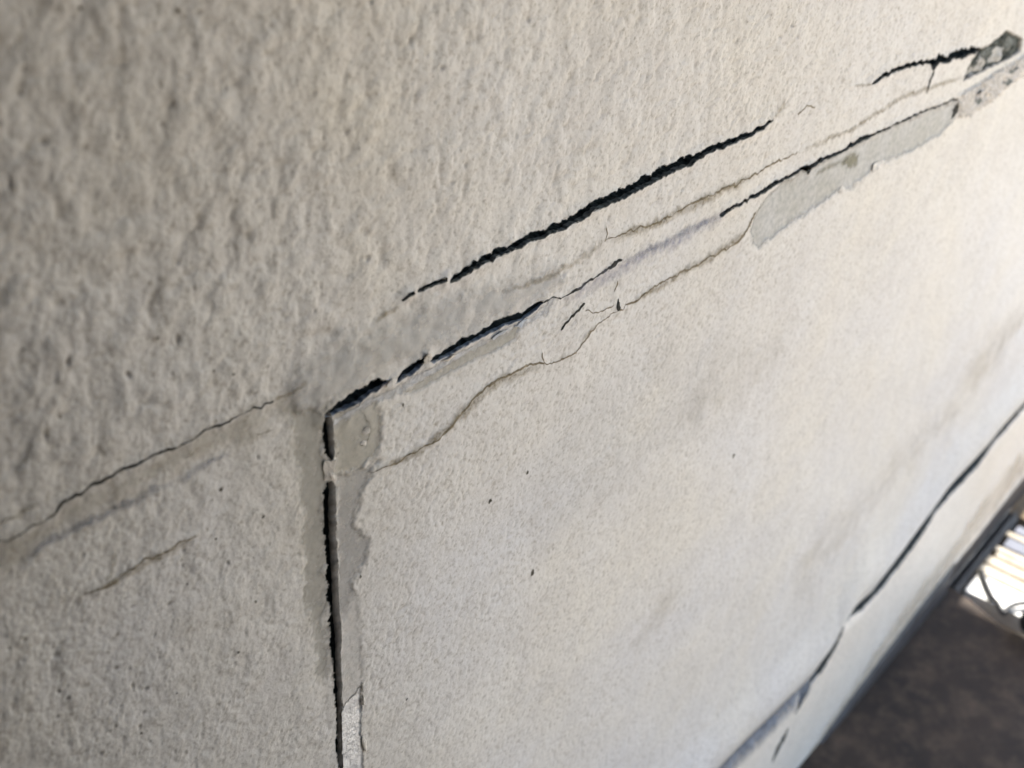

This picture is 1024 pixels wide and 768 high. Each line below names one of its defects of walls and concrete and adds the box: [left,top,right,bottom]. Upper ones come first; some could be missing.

peeling [750,32,1024,247]
crack [0,390,297,542]
peeling [291,402,380,674]
crack [321,46,980,768]